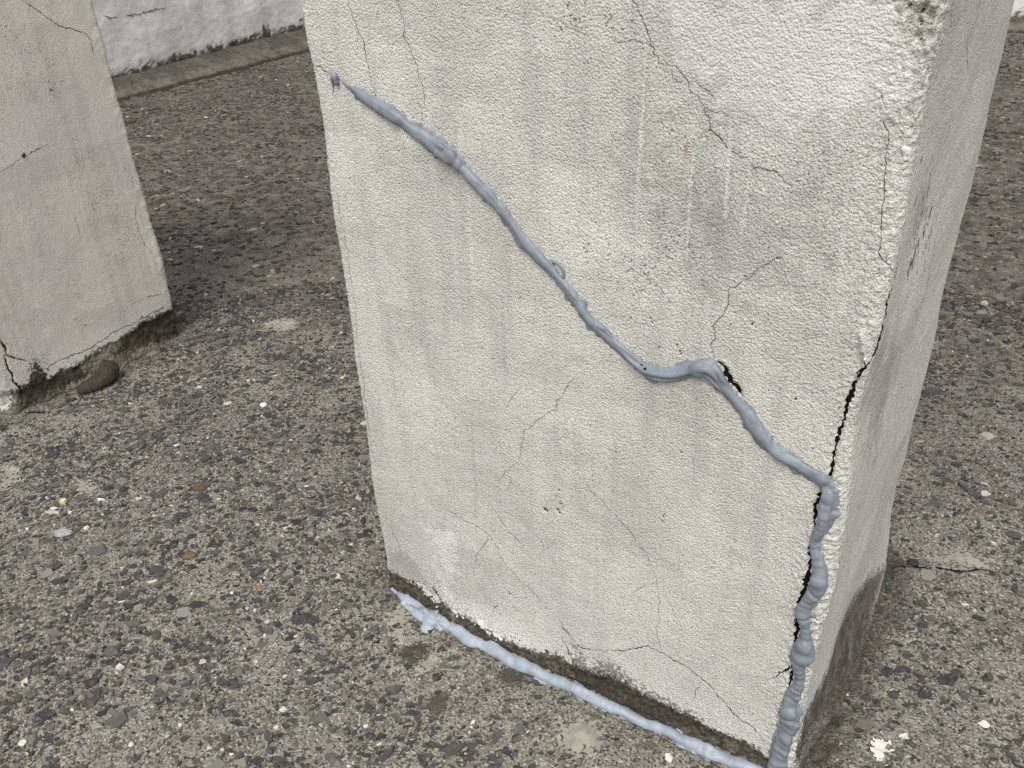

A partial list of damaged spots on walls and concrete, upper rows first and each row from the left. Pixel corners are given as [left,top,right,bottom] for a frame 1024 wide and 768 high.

crack [24,2,165,55]
crack [534,0,793,187]
crack [0,294,166,424]
crack [449,91,898,744]
water stain [396,641,435,667]
water stain [493,666,527,690]
water stain [425,691,454,720]